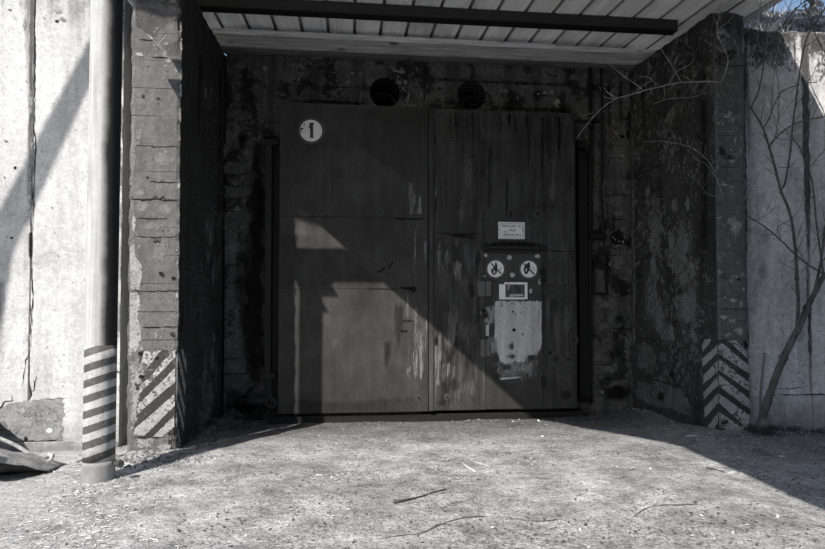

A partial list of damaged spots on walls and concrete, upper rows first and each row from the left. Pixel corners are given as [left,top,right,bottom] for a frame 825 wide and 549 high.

crack [30,6,38,227]
peeling [120,122,142,190]
leakage [713,13,825,247]
crack [0,253,63,408]
peeling [117,190,179,451]
peeling [407,294,571,396]